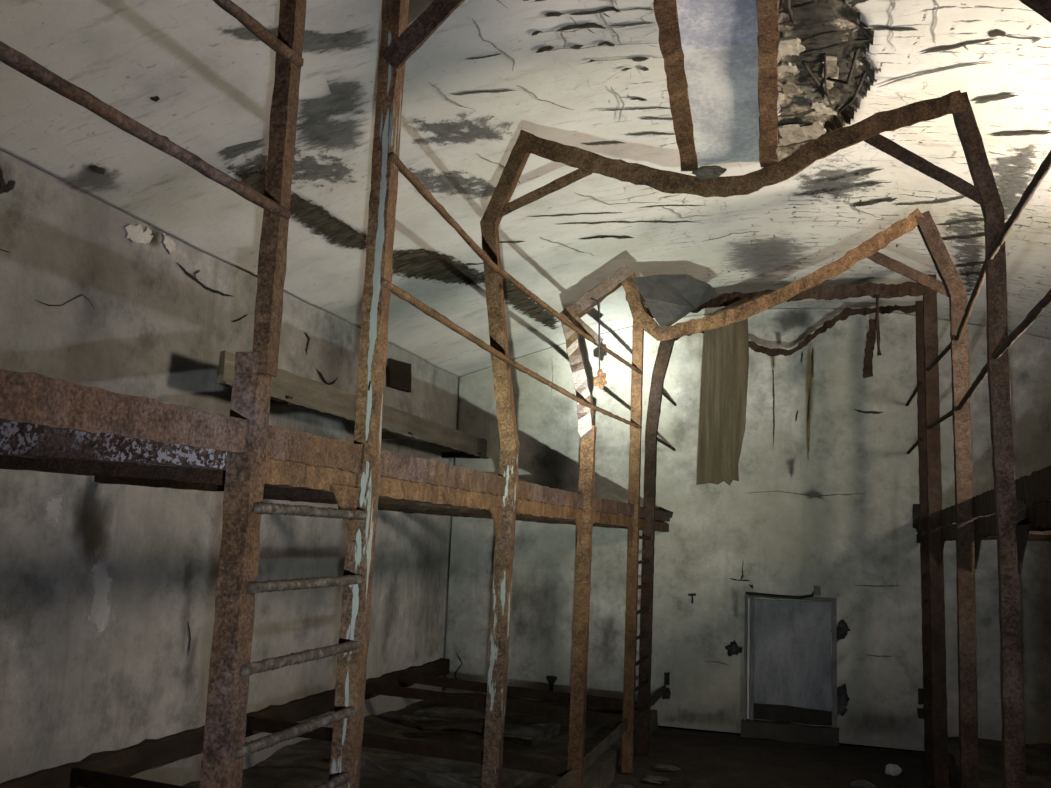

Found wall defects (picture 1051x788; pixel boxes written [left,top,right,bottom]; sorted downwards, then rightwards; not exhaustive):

leakage [223,27,278,41]
leakage [303,30,372,53]
crack [844,0,1042,88]
crack [430,0,675,145]
spalling [777,0,881,162]
crack [974,94,1019,104]
leakage [292,80,364,192]
leakage [220,139,268,173]
peeling [0,168,15,194]
crack [176,262,248,322]
spalling [831,619,850,641]
spalling [725,640,743,656]